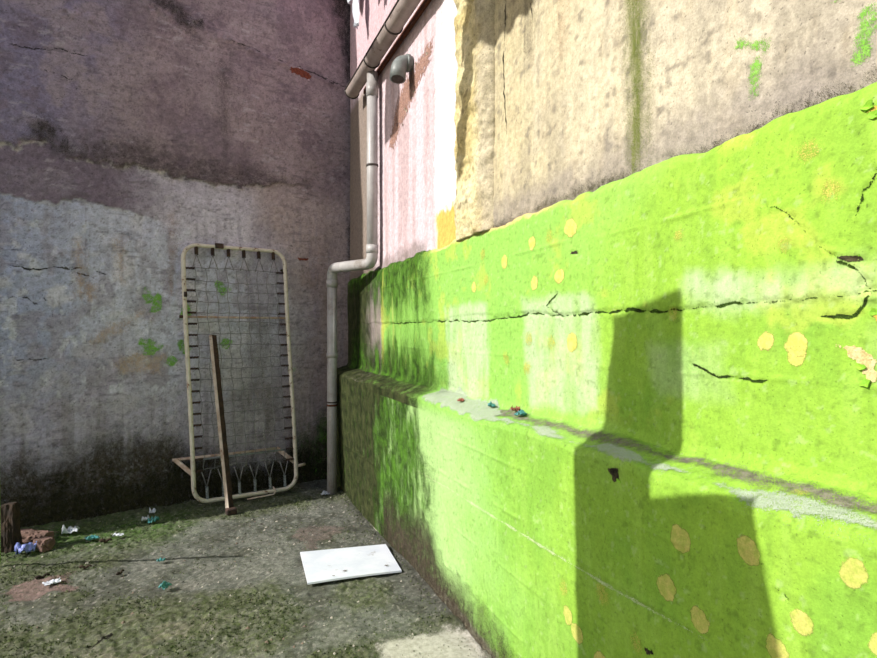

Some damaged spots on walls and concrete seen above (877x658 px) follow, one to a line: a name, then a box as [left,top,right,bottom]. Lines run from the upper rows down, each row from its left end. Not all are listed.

crack [12,43,87,80]
crack [230,40,344,87]
crack [386,246,876,325]
crack [692,363,767,383]
damp [0,279,454,541]